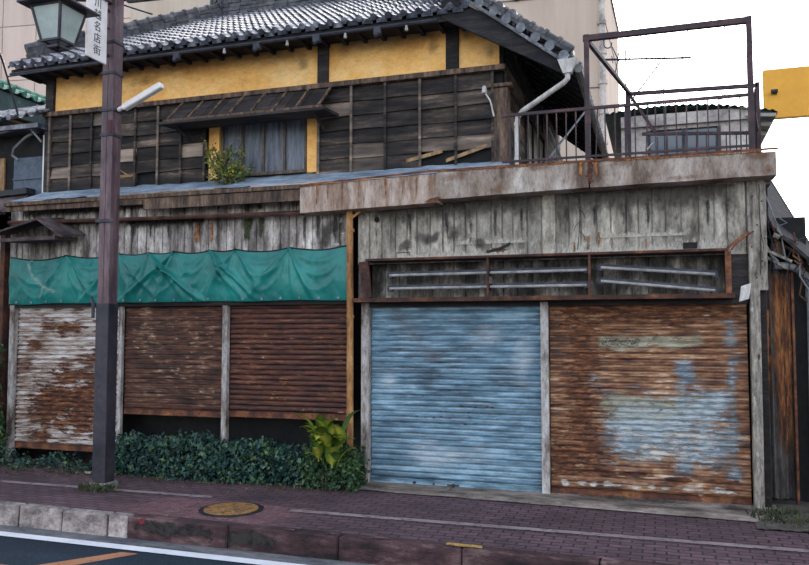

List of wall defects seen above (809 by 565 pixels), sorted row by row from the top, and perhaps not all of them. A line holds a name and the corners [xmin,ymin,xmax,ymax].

rust [15,346,95,446]
rust [27,319,96,351]
rust [540,304,740,484]
peeling [592,359,739,473]
rust [767,273,794,453]
peeling [560,479,621,487]
peeling [629,478,736,496]